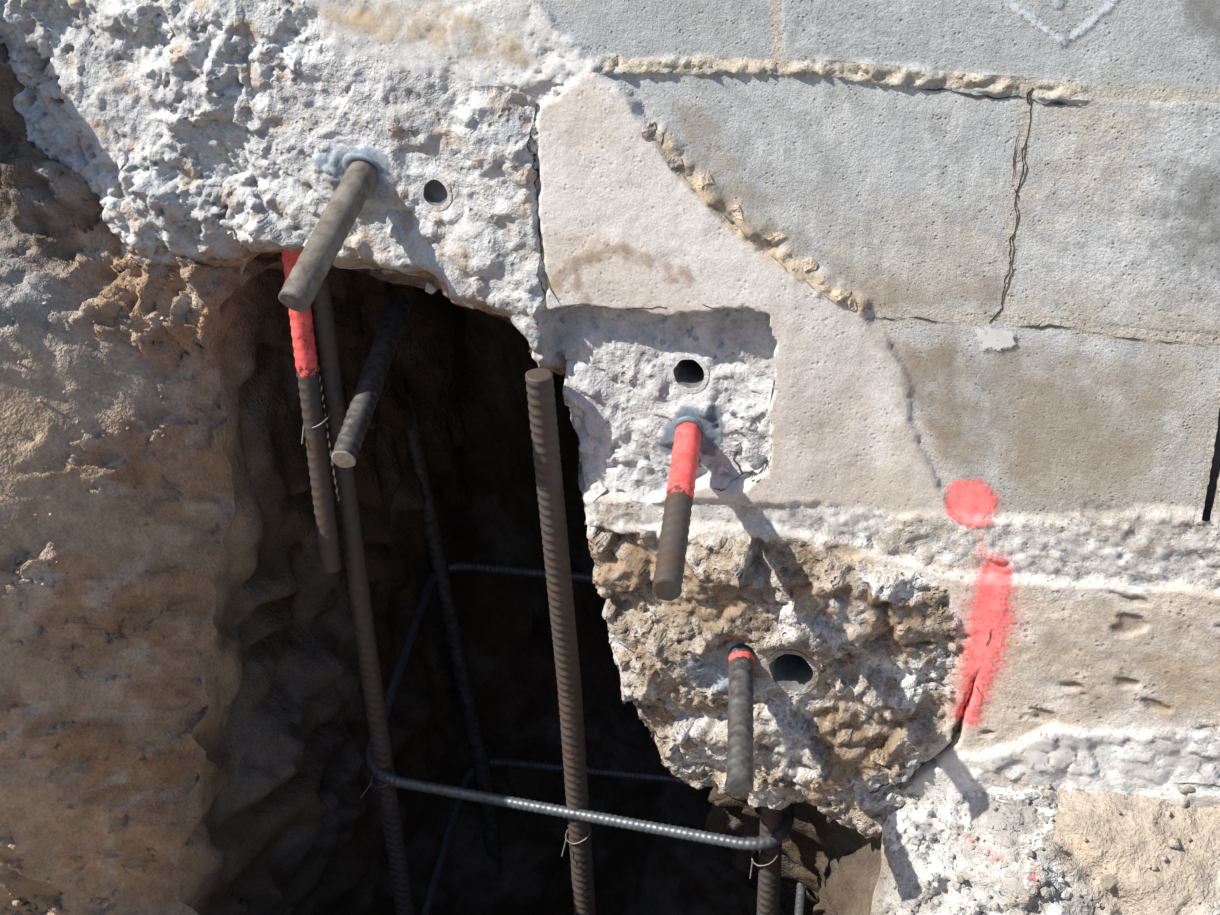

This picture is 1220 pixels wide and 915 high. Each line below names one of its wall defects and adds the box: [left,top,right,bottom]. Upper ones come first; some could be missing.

crack [527,104,667,310]
crack [922,88,1207,345]
crack [868,316,954,324]
spalling [0,0,963,915]
crack [870,630,991,793]